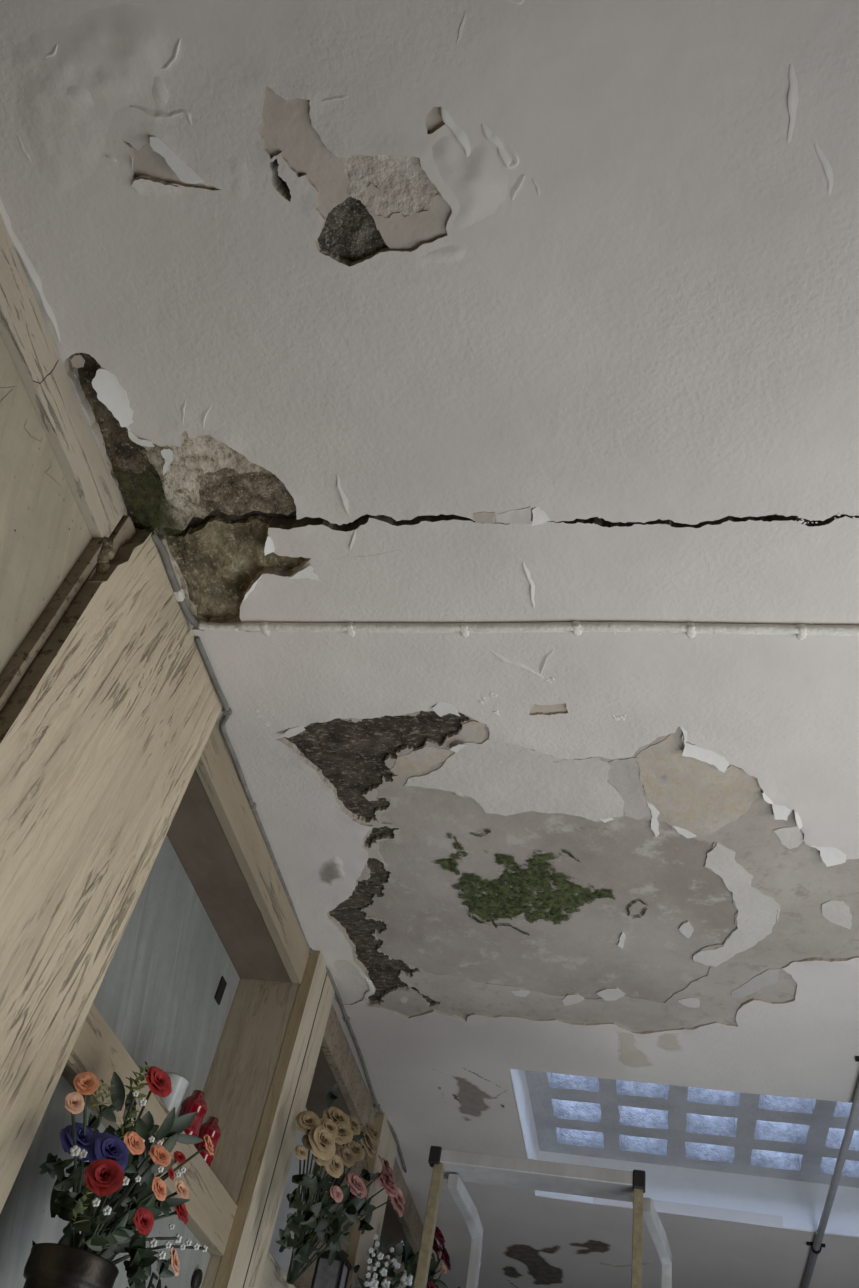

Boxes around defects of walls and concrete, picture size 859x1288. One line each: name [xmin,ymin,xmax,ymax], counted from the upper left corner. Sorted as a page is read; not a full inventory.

peeling [106,136,217,197]
flaking render [259,86,467,264]
flaking render [68,353,319,627]
crack [166,510,297,536]
crack [329,474,410,561]
crack [473,506,550,526]
crack [798,512,859,525]
peeling [279,693,859,1066]